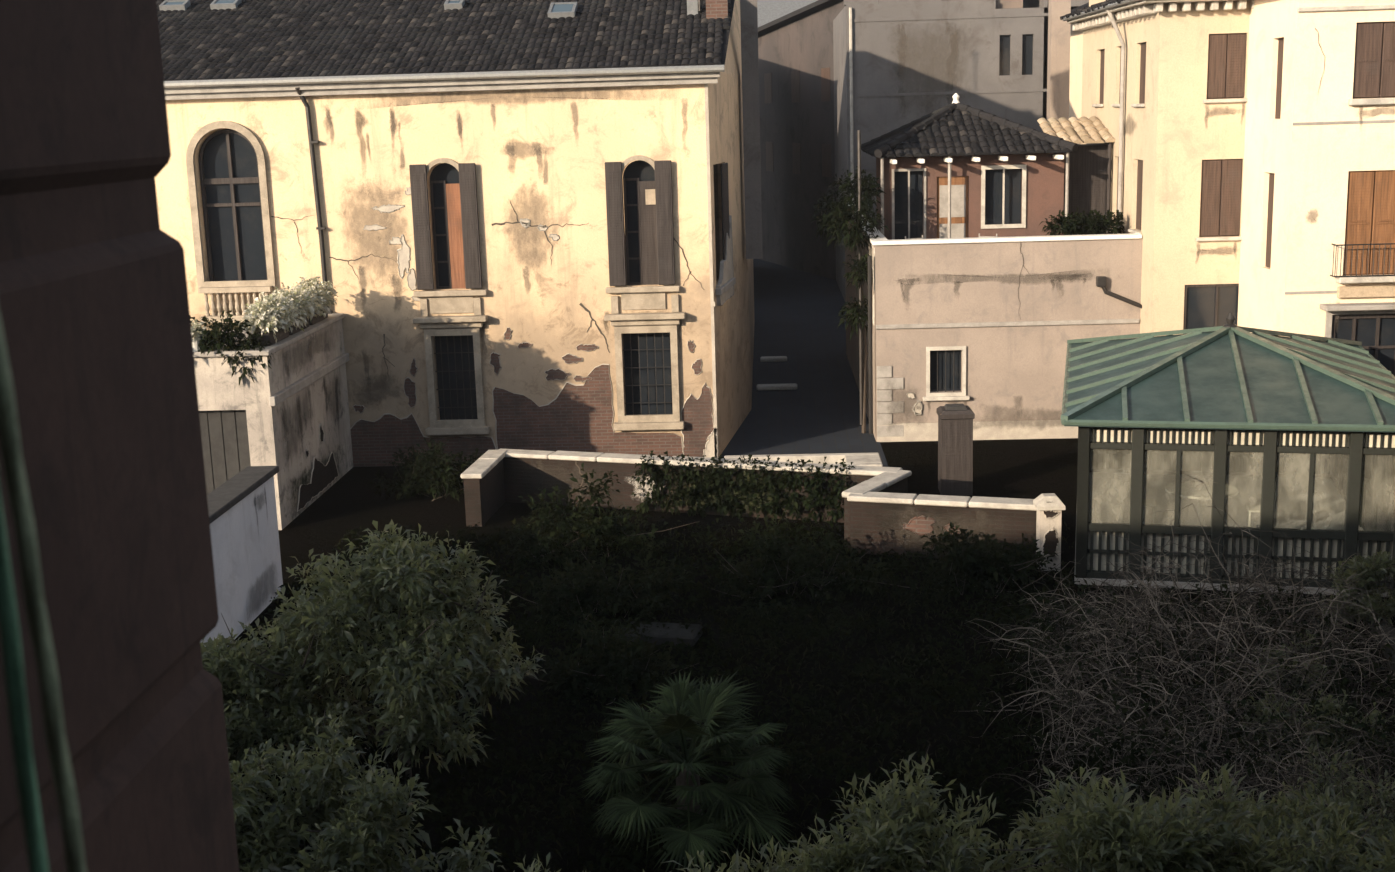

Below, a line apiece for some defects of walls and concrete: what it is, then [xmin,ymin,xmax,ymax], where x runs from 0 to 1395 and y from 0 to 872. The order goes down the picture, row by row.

crack [271,215,398,279]
crack [491,202,589,263]
crack [579,303,610,353]
flaking render [297,327,719,512]